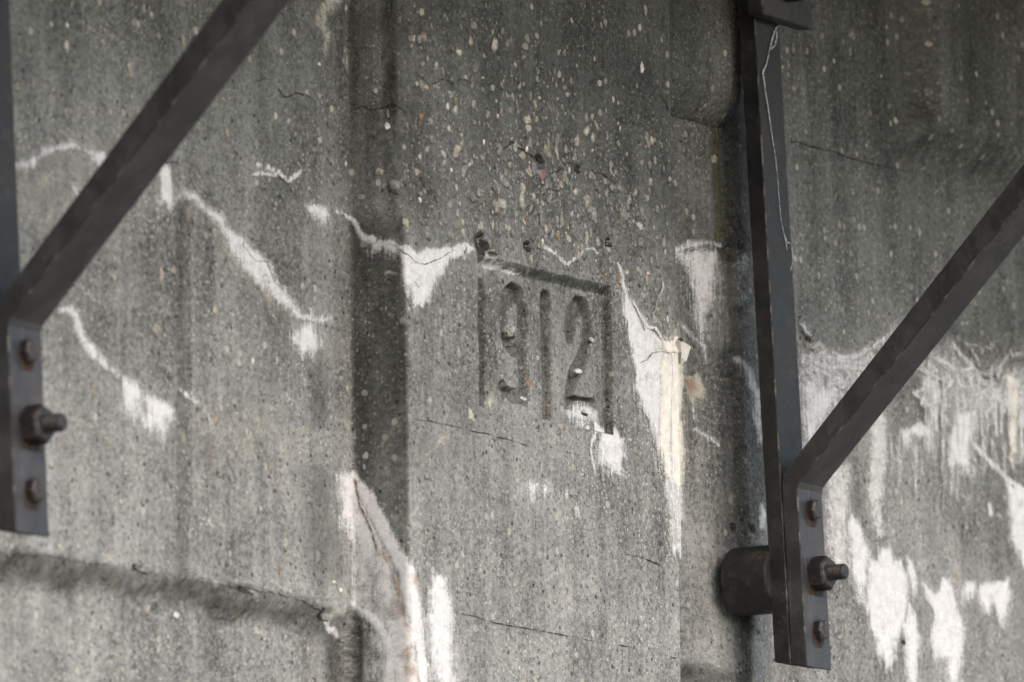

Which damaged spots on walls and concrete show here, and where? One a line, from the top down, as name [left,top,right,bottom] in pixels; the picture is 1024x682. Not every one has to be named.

efflorescence [16,142,107,188]
efflorescence [58,305,176,444]
efflorescence [159,161,333,361]
efflorescence [304,202,521,310]
damp [617,127,752,558]
efflorescence [797,323,895,448]
damp [336,471,459,682]
efflorescence [824,342,1024,682]